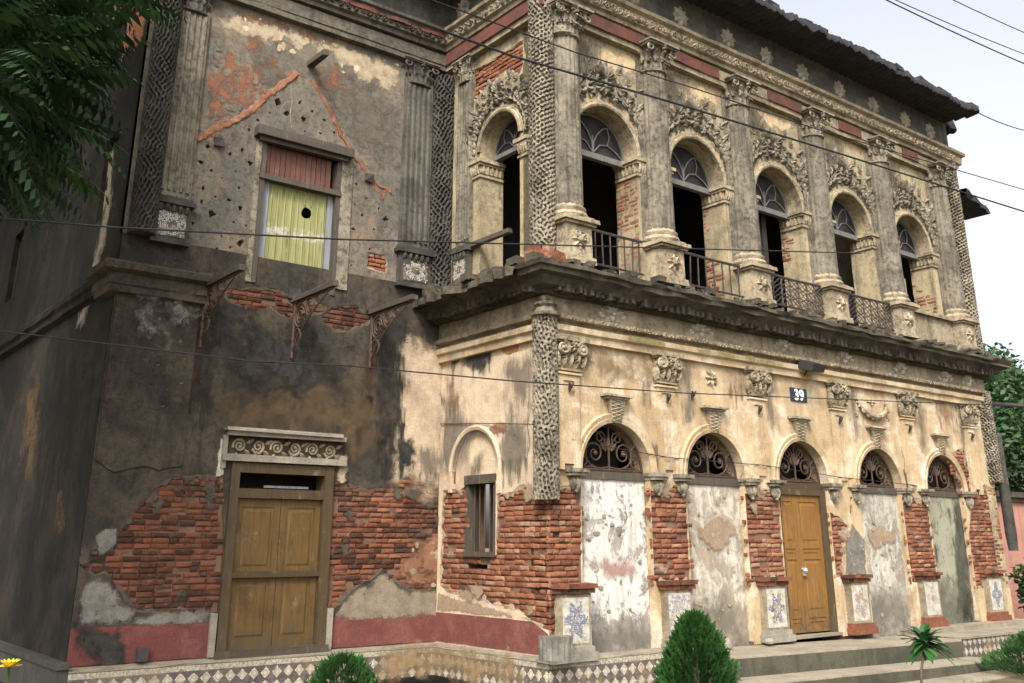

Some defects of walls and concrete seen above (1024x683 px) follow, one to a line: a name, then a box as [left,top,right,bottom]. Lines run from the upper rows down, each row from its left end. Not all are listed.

peeling [200,14,338,132]
flaking render [475,41,523,99]
leakage [237,317,334,400]
flaking render [212,286,388,333]
flaking render [366,252,388,273]
leakage [451,352,491,386]
leakage [500,361,531,483]
flaking render [79,474,230,614]
flaking render [328,474,633,635]
flaking render [602,484,786,586]
flaking render [827,496,940,584]
flaking render [946,447,1008,590]